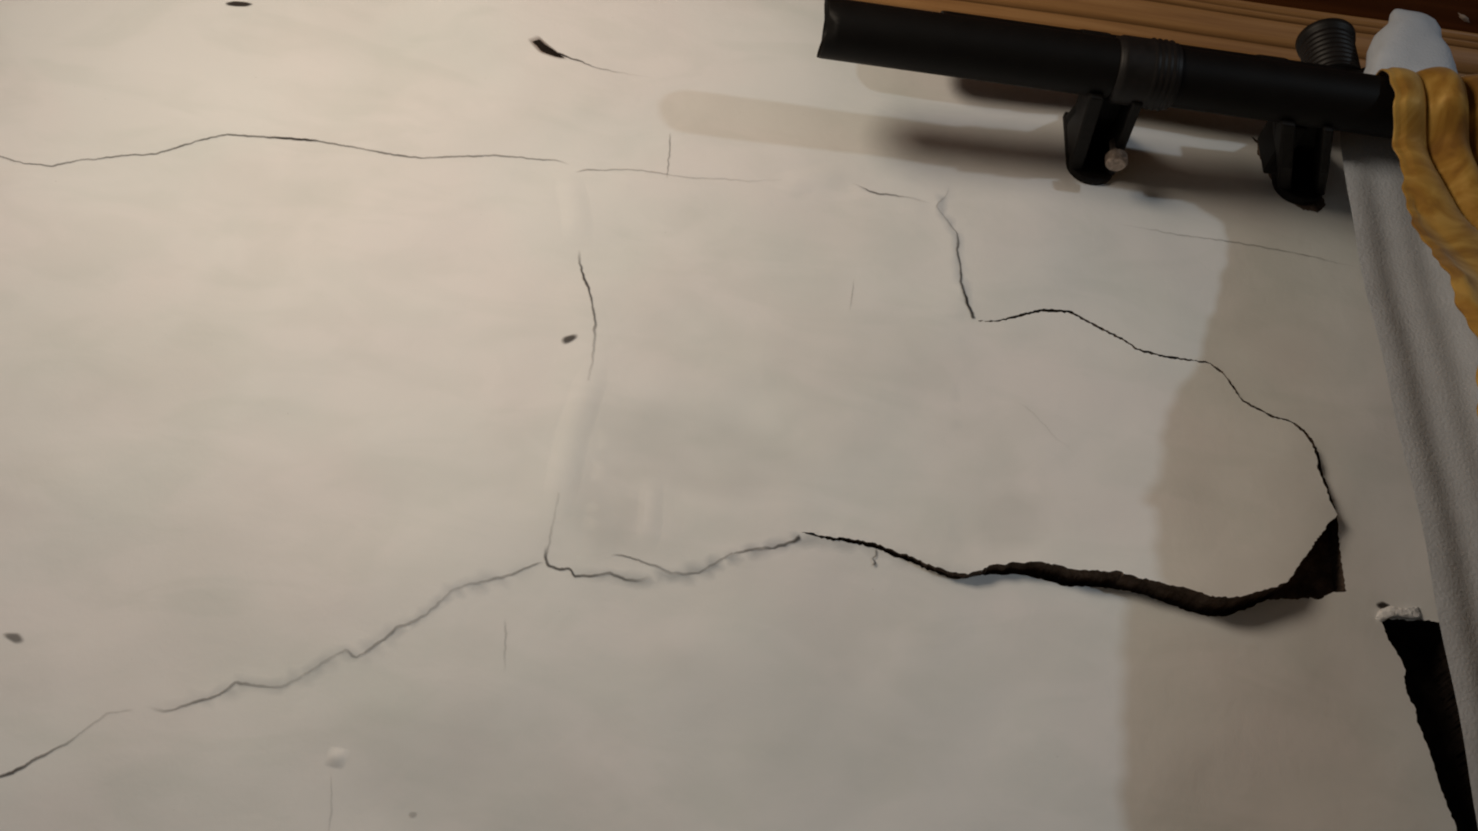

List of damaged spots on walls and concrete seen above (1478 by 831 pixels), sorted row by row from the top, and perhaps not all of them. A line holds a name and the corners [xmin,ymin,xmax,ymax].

crack [10,134,419,166]
crack [579,263,596,323]
crack [956,242,1346,617]
crack [773,536,800,549]
crack [545,555,628,580]
crack [0,751,51,777]